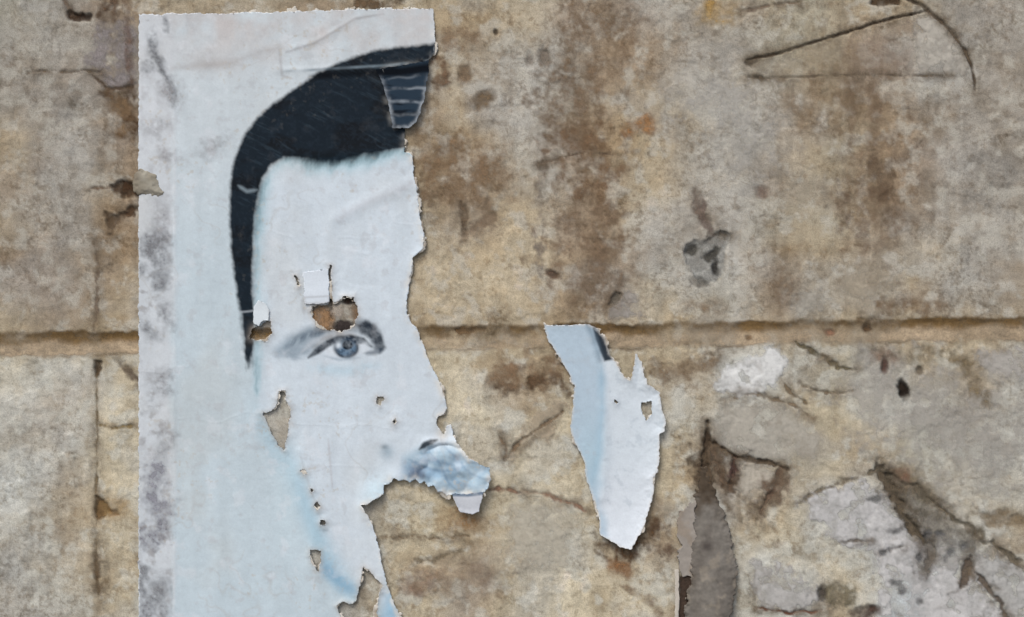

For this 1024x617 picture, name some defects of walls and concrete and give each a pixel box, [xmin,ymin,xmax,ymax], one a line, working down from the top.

crack [745,0,976,90]
damp [549,59,624,221]
spalling [459,201,496,235]
spalling [684,196,731,287]
spalling [313,296,359,332]
spalling [455,326,483,335]
crack [733,341,853,419]
crack [701,420,789,515]
flaking render [674,466,826,617]
flaking render [797,478,1024,617]
crack [804,463,1024,617]
crack [755,607,822,615]